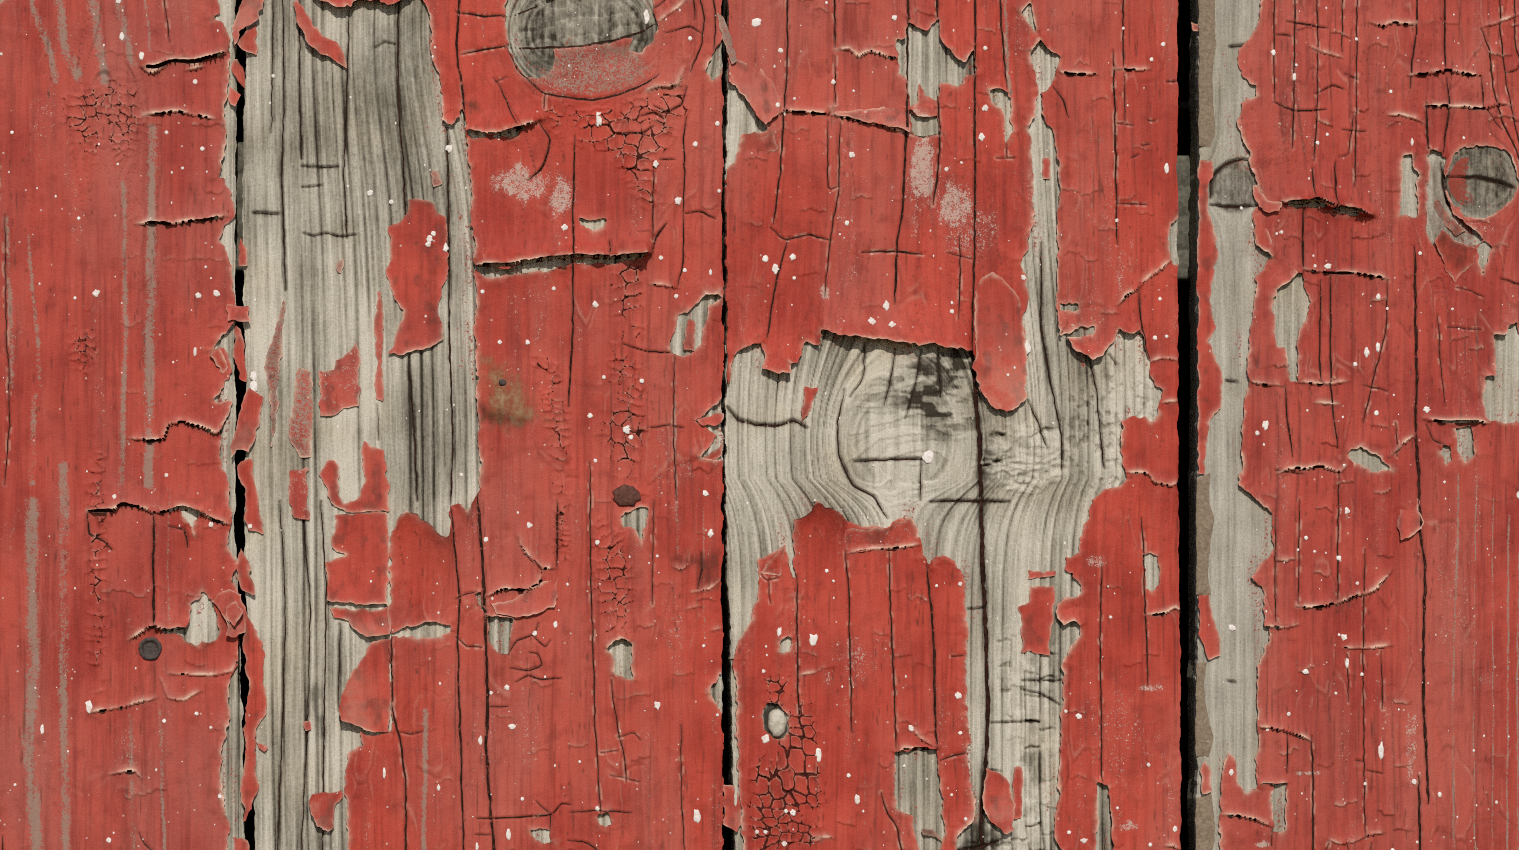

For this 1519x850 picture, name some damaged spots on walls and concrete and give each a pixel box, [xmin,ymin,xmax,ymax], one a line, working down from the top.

crack [63,0,217,155]
peeling [144,0,658,850]
crack [729,0,1063,850]
peeling [696,3,1163,850]
crack [1210,159,1252,208]
peeling [1164,0,1368,850]
crack [1229,0,1519,850]
peeling [1441,323,1519,464]